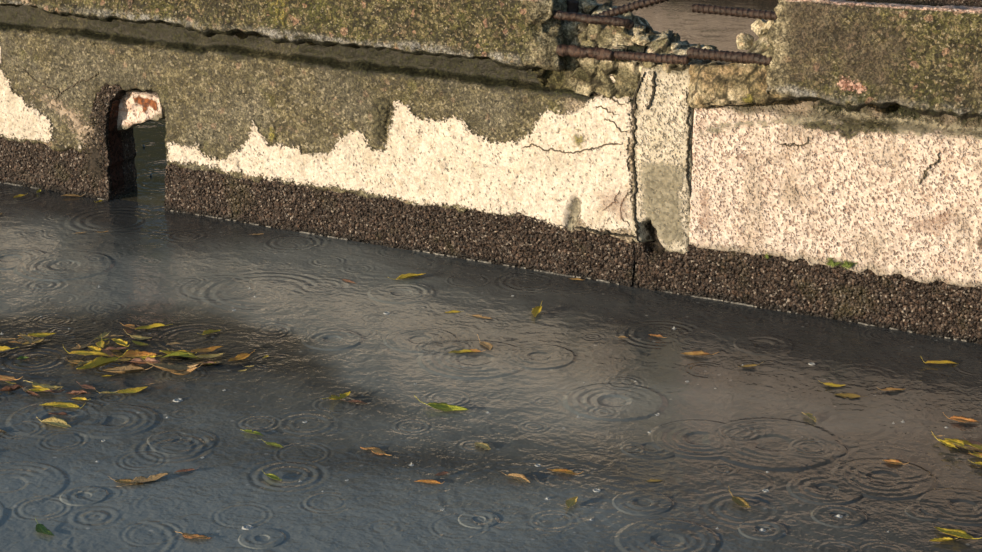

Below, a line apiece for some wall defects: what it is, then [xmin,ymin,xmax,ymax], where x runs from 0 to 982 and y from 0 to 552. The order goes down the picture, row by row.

peeling [0,70,53,143]
corrosion [108,96,157,194]
peeling [166,93,633,233]
crack [522,71,656,243]
crack [684,92,692,197]
spalling [645,221,665,257]